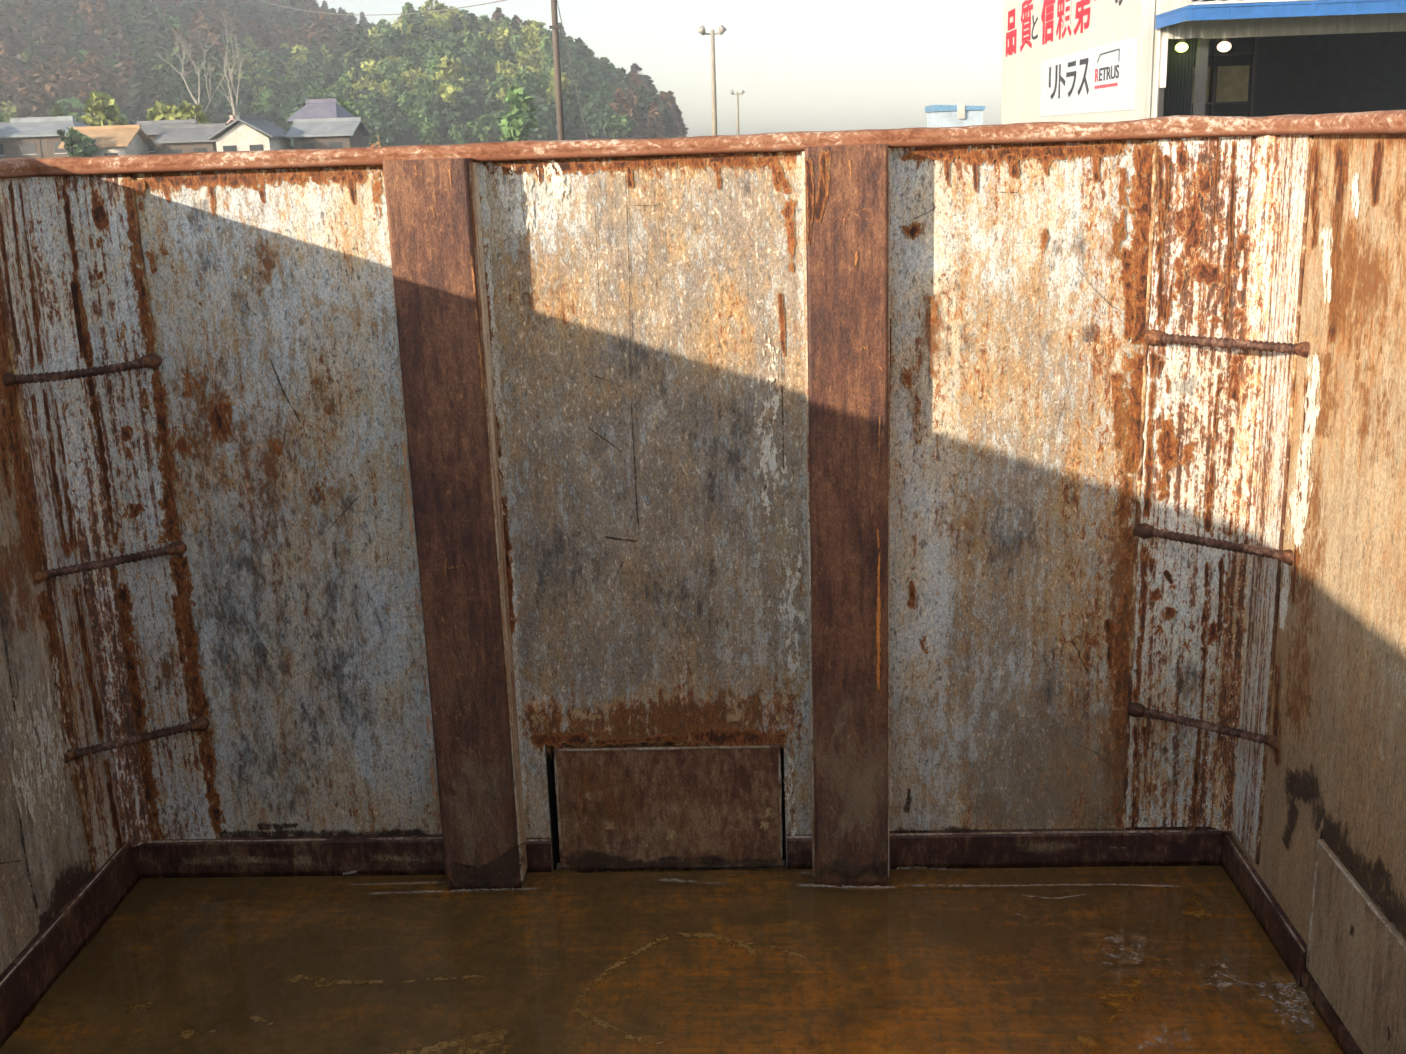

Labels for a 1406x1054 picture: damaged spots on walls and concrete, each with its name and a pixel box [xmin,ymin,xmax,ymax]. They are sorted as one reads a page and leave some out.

corrosion [123,165,383,354]
corrosion [890,205,924,240]
corrosion [1212,137,1236,331]
corrosion [72,585,105,741]
corrosion [61,182,119,546]
corrosion [112,345,438,840]
corrosion [471,265,801,754]
corrosion [890,282,949,444]
corrosion [901,140,1223,837]
corrosion [1200,558,1228,703]
corrosion [1271,137,1406,768]
corrosion [103,757,123,850]